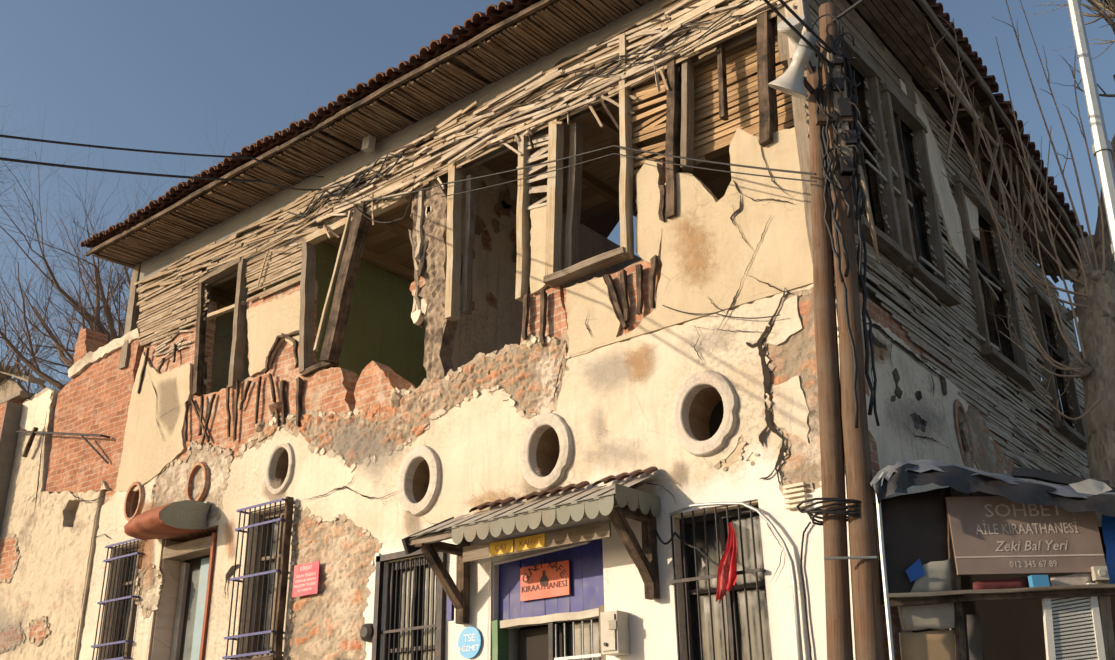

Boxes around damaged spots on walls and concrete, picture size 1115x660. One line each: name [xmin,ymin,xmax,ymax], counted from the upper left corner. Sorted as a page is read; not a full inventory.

crack [686,140,795,485]
water stain [627,347,649,380]
flaking render [150,333,571,521]
spalling [891,368,928,432]
crack [304,473,397,504]
flaking render [0,533,21,584]
flaking render [284,500,383,660]
crack [760,510,784,582]
flaking render [0,616,51,654]